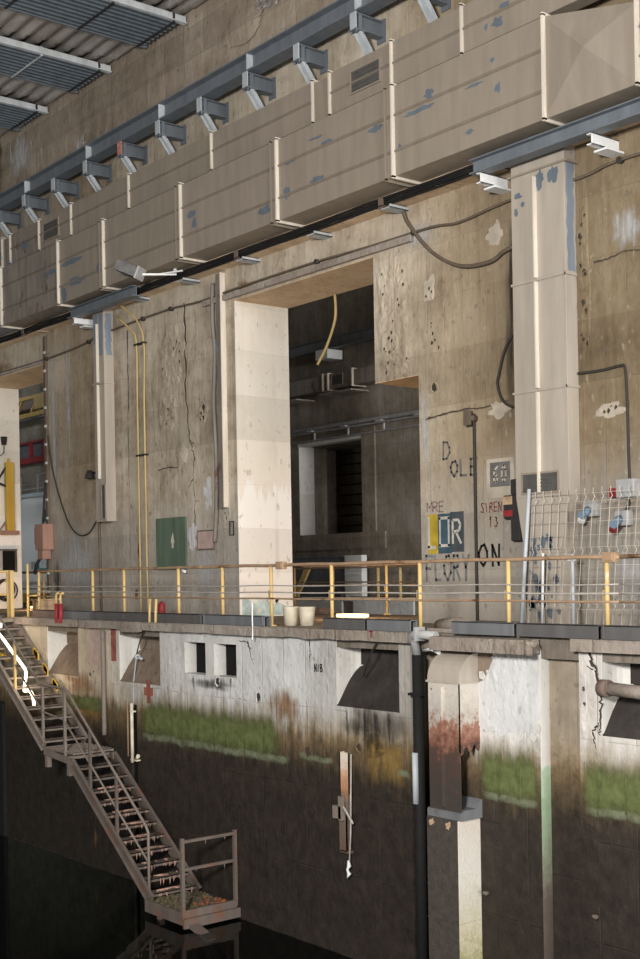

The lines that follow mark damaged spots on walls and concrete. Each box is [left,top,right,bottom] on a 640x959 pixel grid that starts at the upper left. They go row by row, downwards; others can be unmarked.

crack [158,303,197,565]
crack [586,652,604,749]